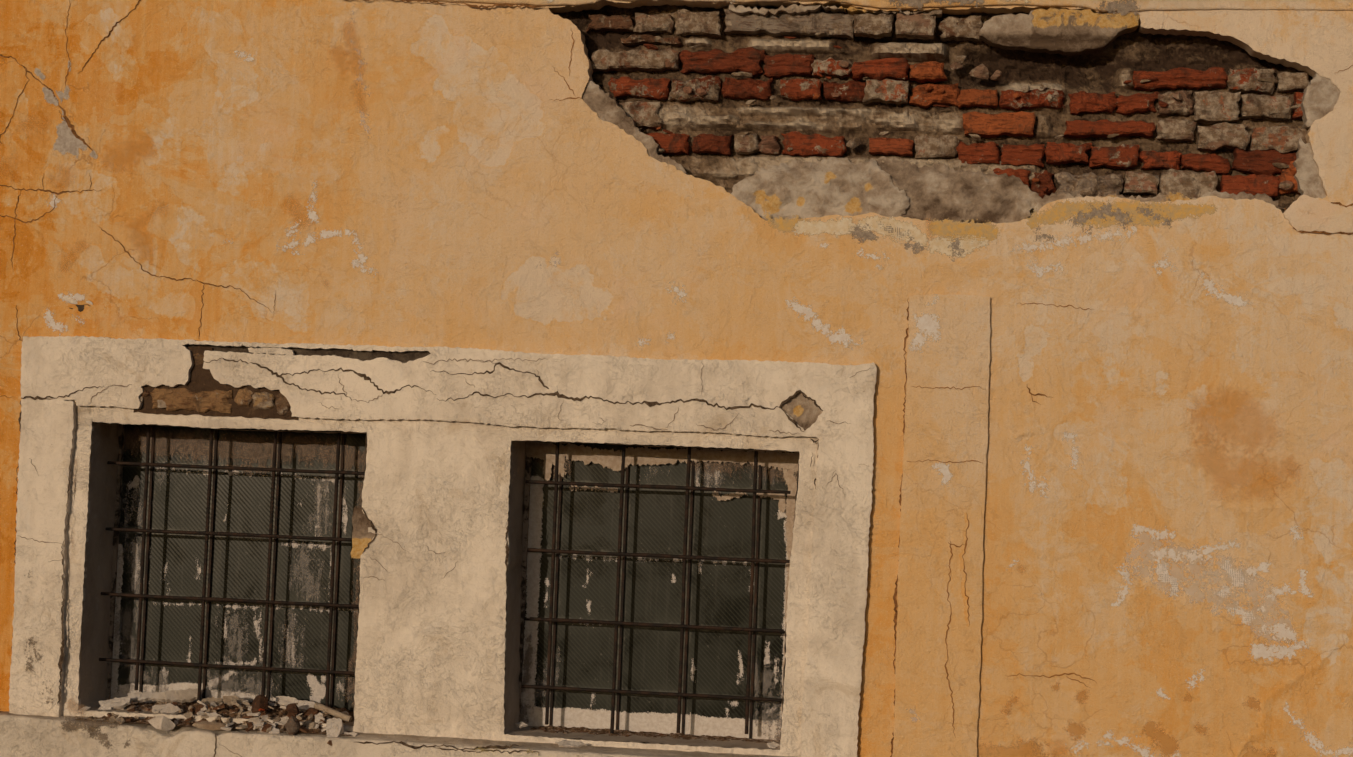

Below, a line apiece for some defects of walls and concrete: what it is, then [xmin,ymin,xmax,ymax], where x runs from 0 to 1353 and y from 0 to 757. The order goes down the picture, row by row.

peeling [34,61,98,159]
crack [0,0,141,268]
spalling [545,0,1353,233]
crack [101,229,867,495]
spalling [780,392,823,430]
spalling [351,507,375,559]
crack [362,507,458,581]
crack [503,522,511,569]
crack [890,301,981,757]
peeling [1130,524,1314,663]
crack [357,741,539,755]